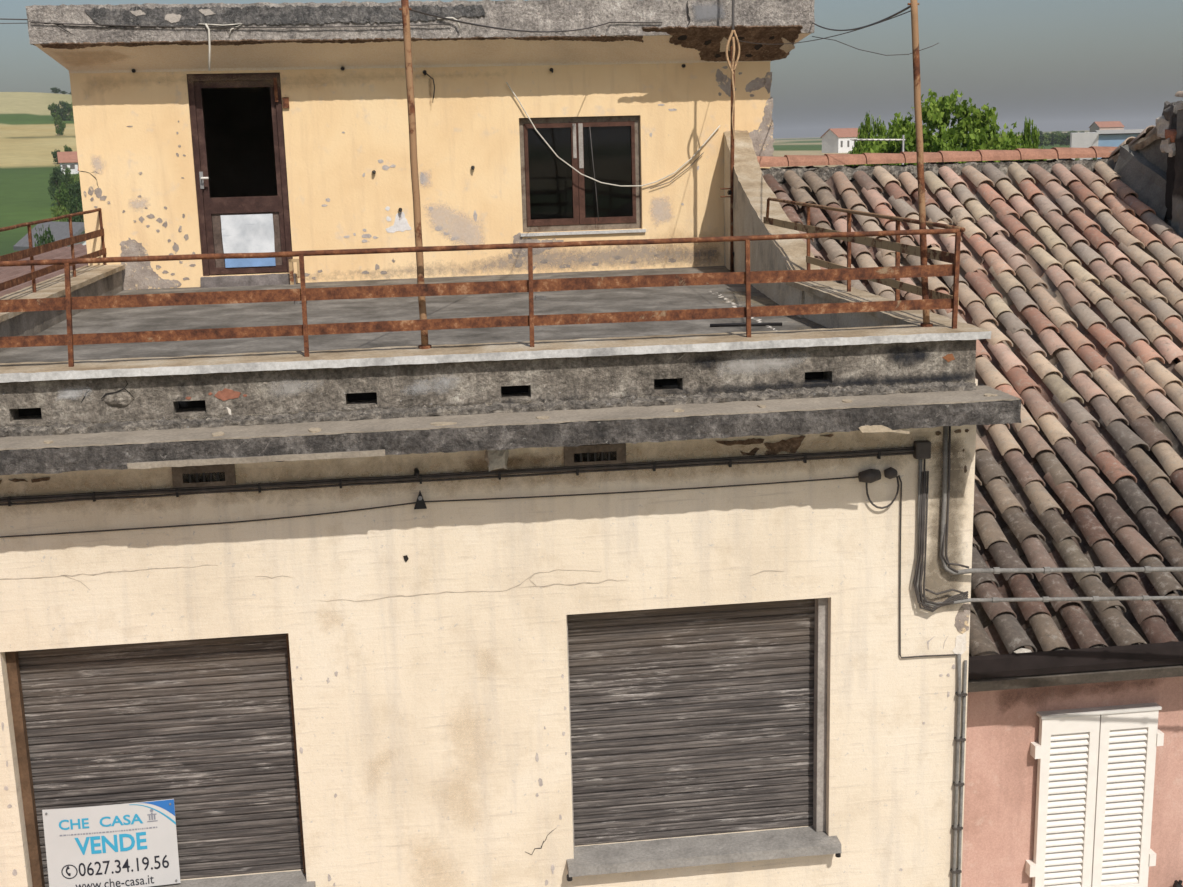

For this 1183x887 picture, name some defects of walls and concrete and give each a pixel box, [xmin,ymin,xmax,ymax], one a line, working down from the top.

spalling [40,1,803,156]
peeling [84,186,111,208]
spalling [119,195,196,290]
peeling [344,206,412,243]
spalling [716,435,806,455]
crack [312,569,623,602]